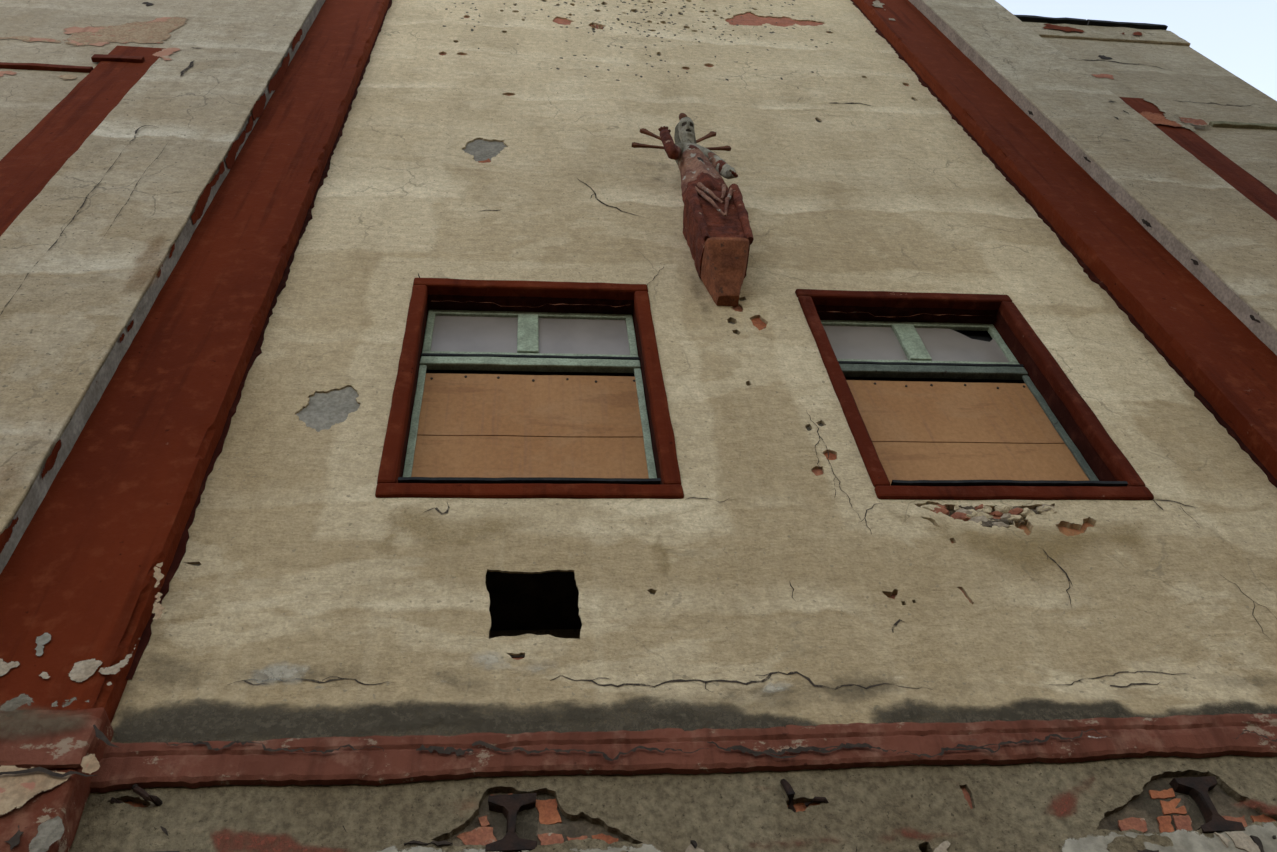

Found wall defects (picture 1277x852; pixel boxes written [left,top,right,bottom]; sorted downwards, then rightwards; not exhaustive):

flaking render [524,0,833,81]
crack [577,178,638,216]
crack [806,410,880,534]
flaking render [921,502,1094,536]
crack [1039,547,1073,607]
peeling [69,638,140,686]
crack [550,671,933,692]
crack [1049,671,1186,688]
flaking render [5,816,64,852]
flaking render [0,754,100,815]
flaking render [442,792,629,846]
flaking render [1096,775,1276,834]